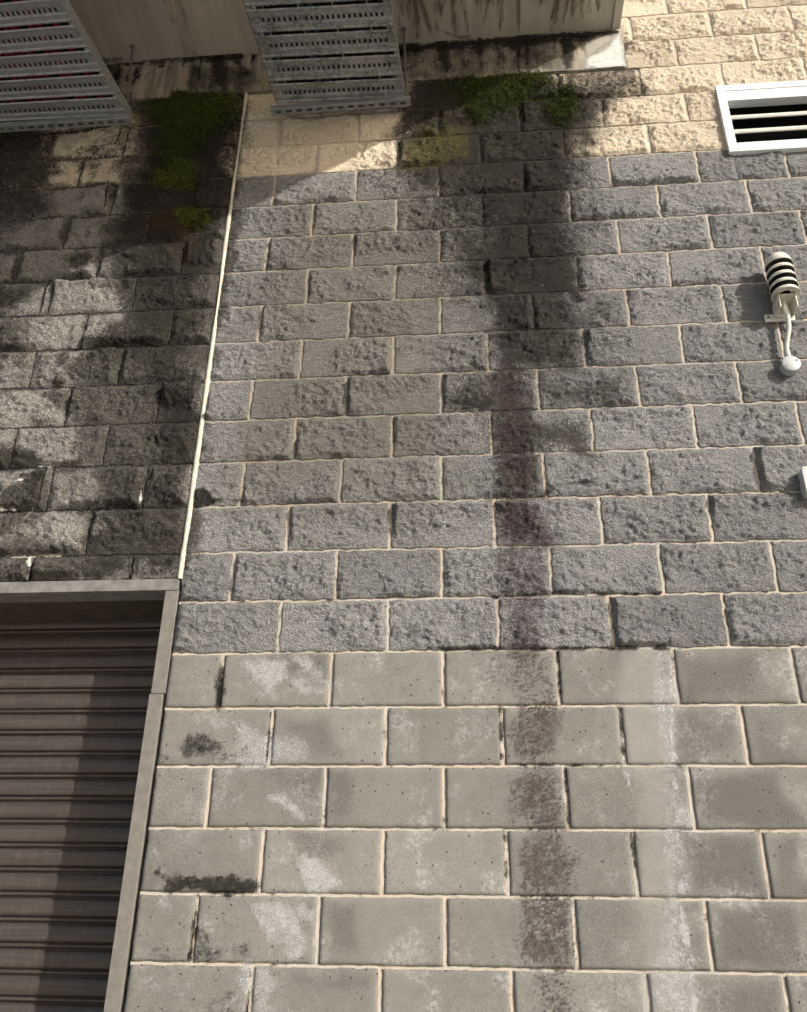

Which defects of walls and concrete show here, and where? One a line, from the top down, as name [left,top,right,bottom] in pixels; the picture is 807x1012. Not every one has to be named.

damp [0,0,261,582]
damp [390,0,650,499]
damp [182,734,226,761]
damp [428,645,639,693]
damp [653,645,678,765]
damp [155,870,259,897]
damp [657,882,698,1012]